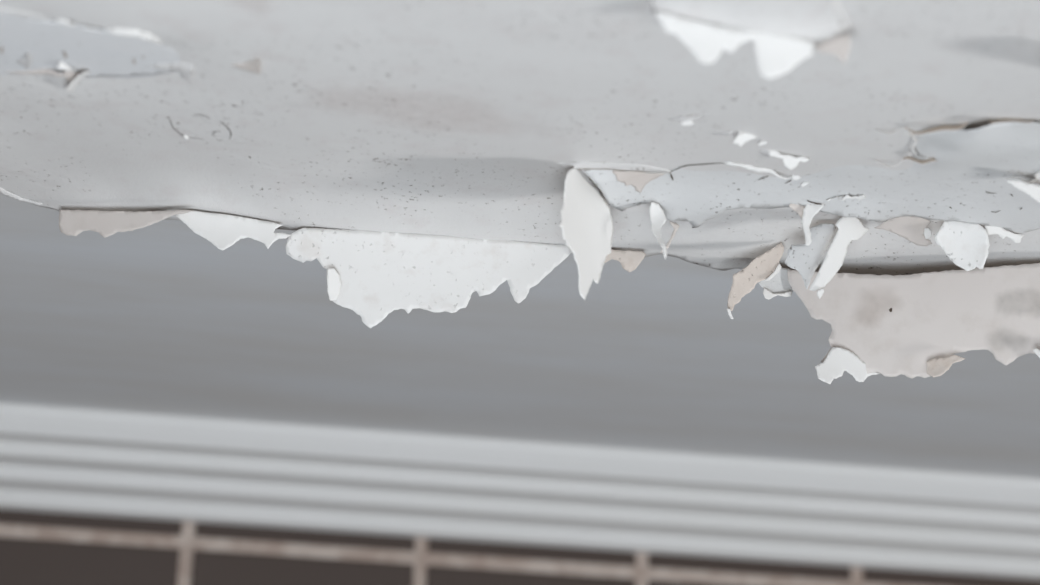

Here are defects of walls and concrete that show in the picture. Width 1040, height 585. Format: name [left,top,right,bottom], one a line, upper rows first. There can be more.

peeling [0,0,1040,384]